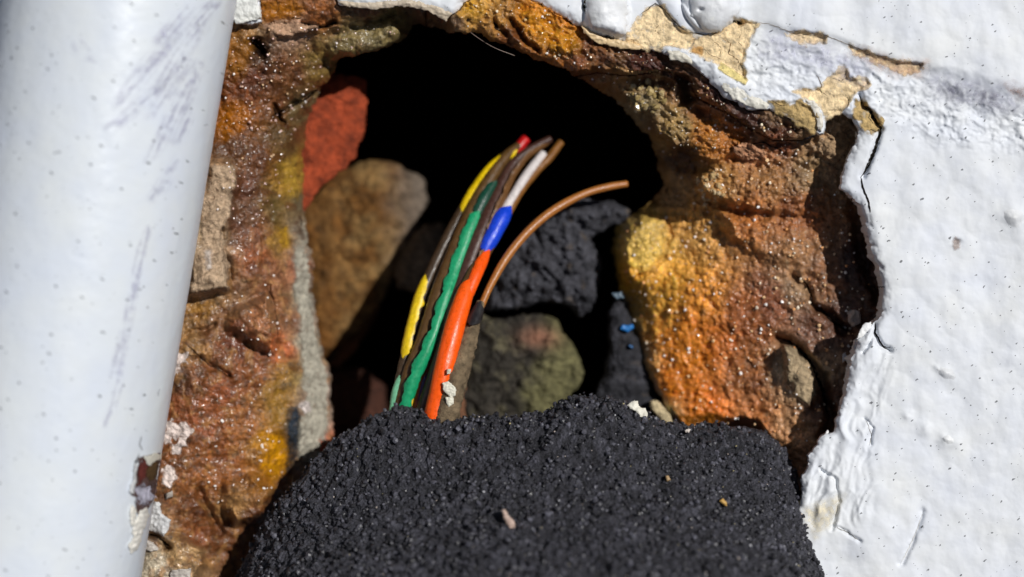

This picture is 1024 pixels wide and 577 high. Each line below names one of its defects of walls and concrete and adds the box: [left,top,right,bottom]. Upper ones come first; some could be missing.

spalling [128,0,885,577]
crack [816,75,882,212]